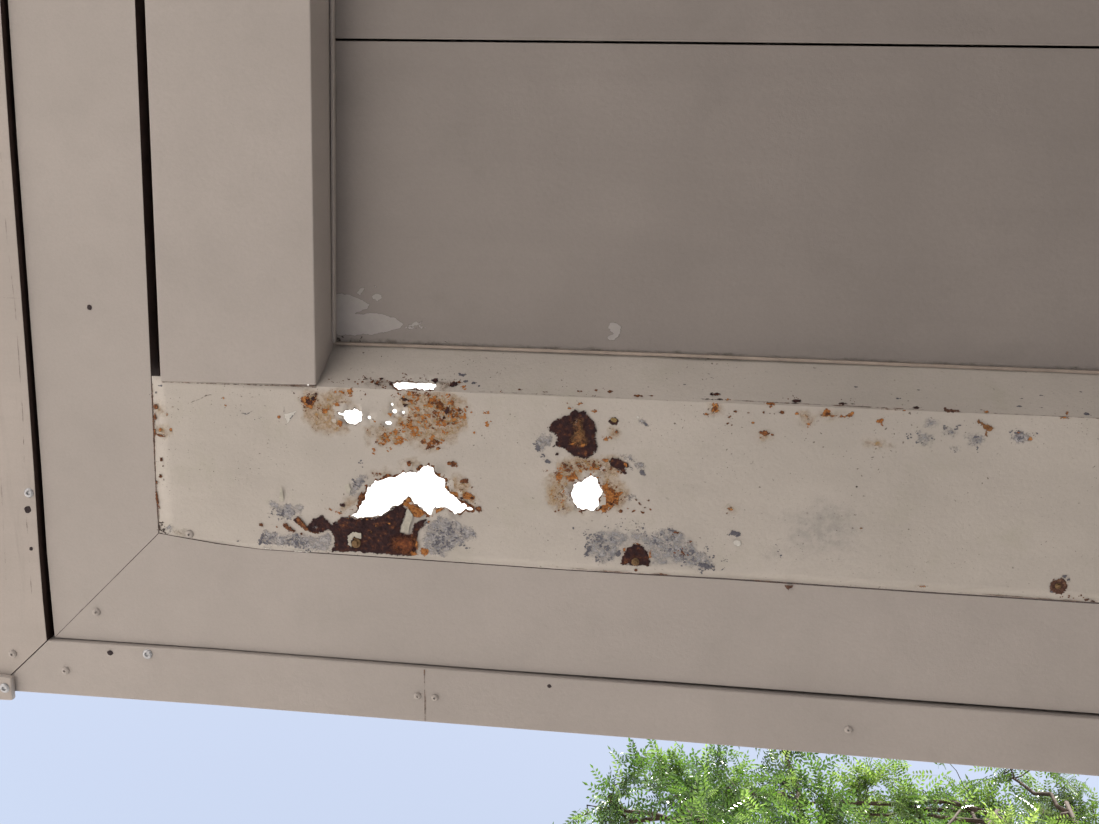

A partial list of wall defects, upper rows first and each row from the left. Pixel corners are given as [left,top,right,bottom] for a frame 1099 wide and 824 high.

peeling [336,286,425,336]
rust [293,373,492,455]
rust [703,392,810,438]
rust [821,399,854,417]
rust [546,389,652,517]
rust [438,461,482,512]
rust [276,472,443,556]
peeling [412,517,476,557]
rust [604,543,667,575]
peeling [572,518,728,574]
rust [1036,575,1095,602]